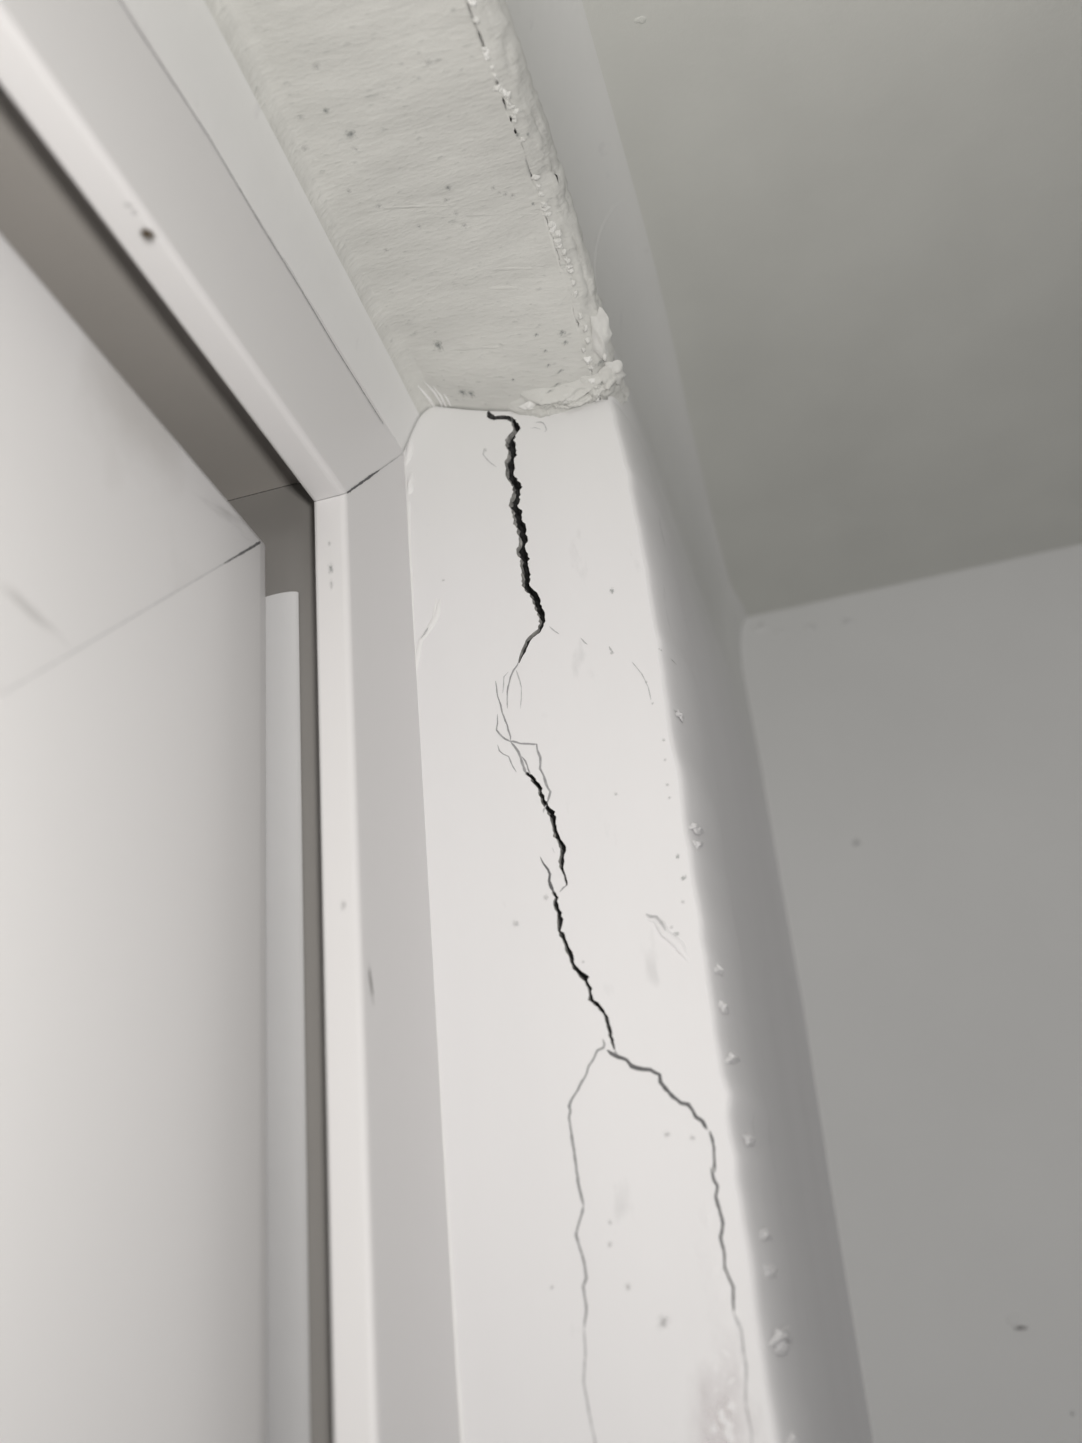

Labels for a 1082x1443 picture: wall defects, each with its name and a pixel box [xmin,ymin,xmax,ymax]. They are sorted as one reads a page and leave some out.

crack [487,411,753,1443]